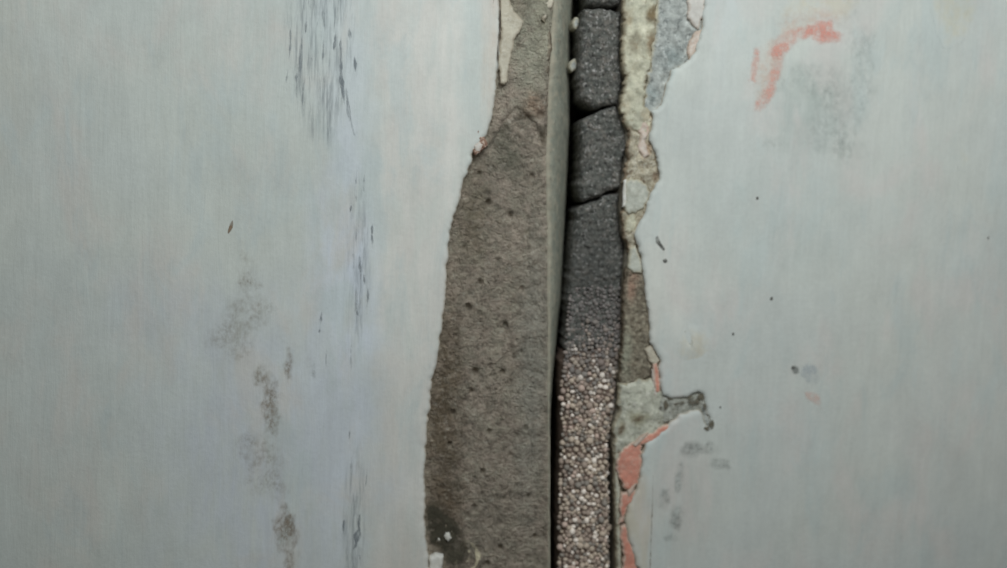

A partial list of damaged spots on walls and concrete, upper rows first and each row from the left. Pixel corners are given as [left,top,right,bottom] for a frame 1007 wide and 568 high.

spalling [424,0,554,568]
spalling [611,0,704,568]